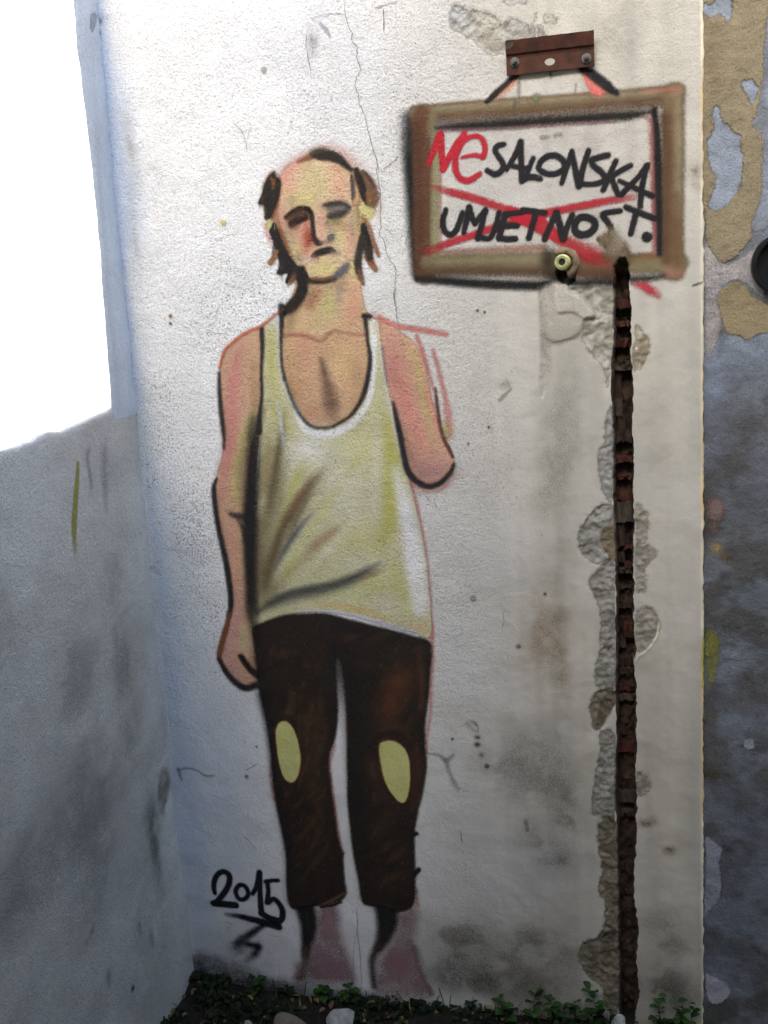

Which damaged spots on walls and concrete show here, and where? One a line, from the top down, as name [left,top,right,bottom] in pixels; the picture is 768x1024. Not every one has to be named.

flaking render [449,5,557,56]
peeling [702,0,768,263]
crack [308,5,403,343]
flaking render [568,283,615,388]
flaking render [632,325,650,370]
peeling [717,282,768,366]
flaking render [633,504,656,592]
flaking render [634,606,660,662]
flaking render [578,406,621,1013]
flaking render [636,773,651,796]
water stain [426,925,569,999]